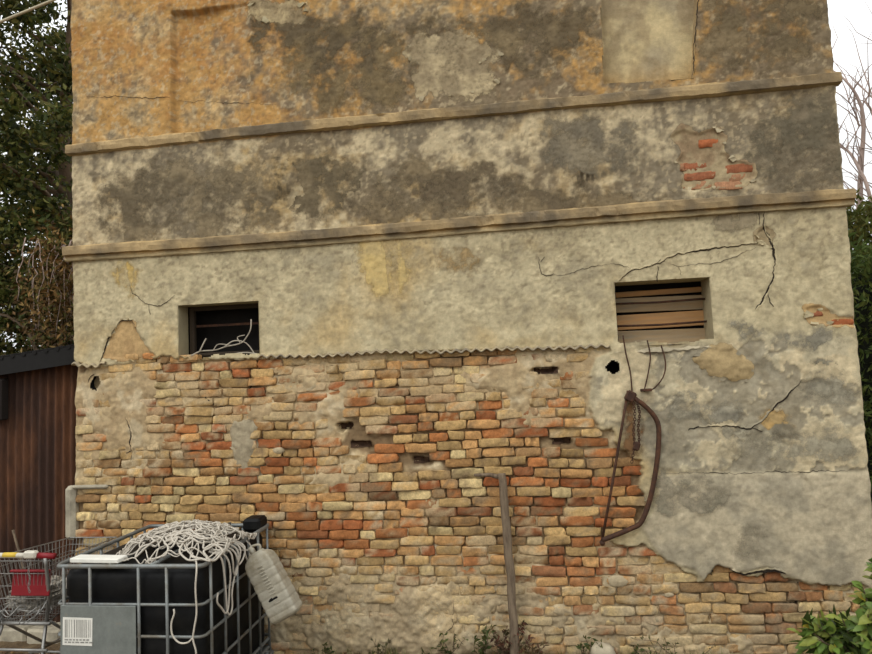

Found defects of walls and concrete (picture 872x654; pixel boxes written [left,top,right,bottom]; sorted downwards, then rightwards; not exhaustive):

crack [692,0,700,71]
spalling [670,123,758,191]
crack [538,212,778,310]
spalling [103,318,160,362]
spalling [605,360,620,374]
spalling [802,303,854,328]
crack [688,378,802,432]